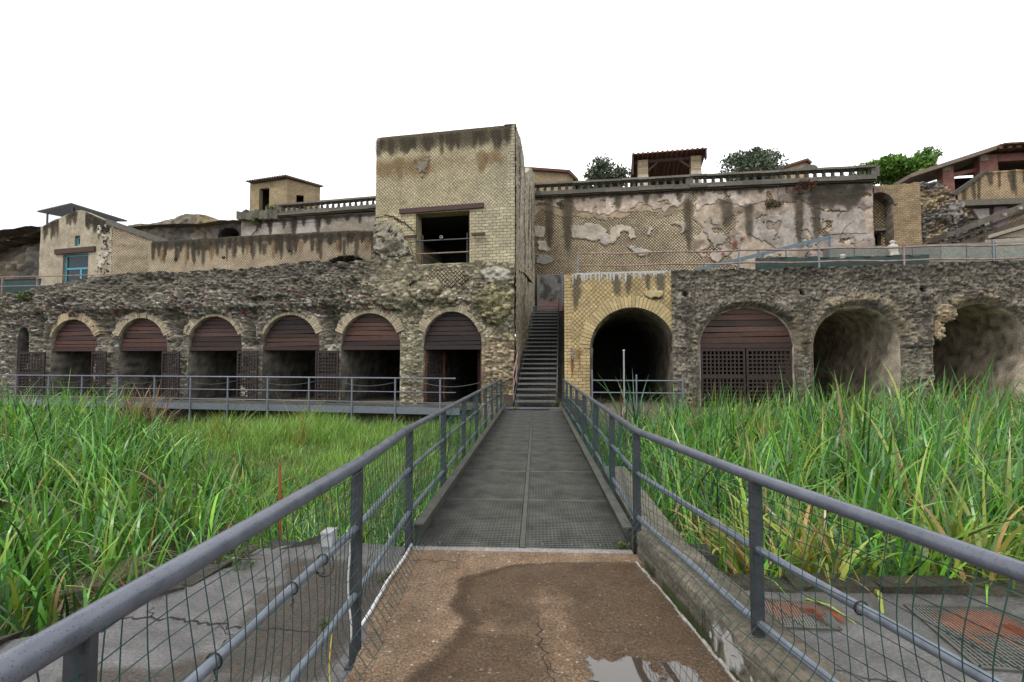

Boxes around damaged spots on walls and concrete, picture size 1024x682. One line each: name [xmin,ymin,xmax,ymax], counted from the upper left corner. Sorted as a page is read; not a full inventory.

damp [374,125,511,154]
damp [151,212,376,260]
flaking render [535,184,875,270]
damp [540,270,671,306]
crack [124,607,312,645]
damp [409,562,753,682]
rust [765,602,845,622]
rust [943,610,1024,649]
crack [537,617,568,682]